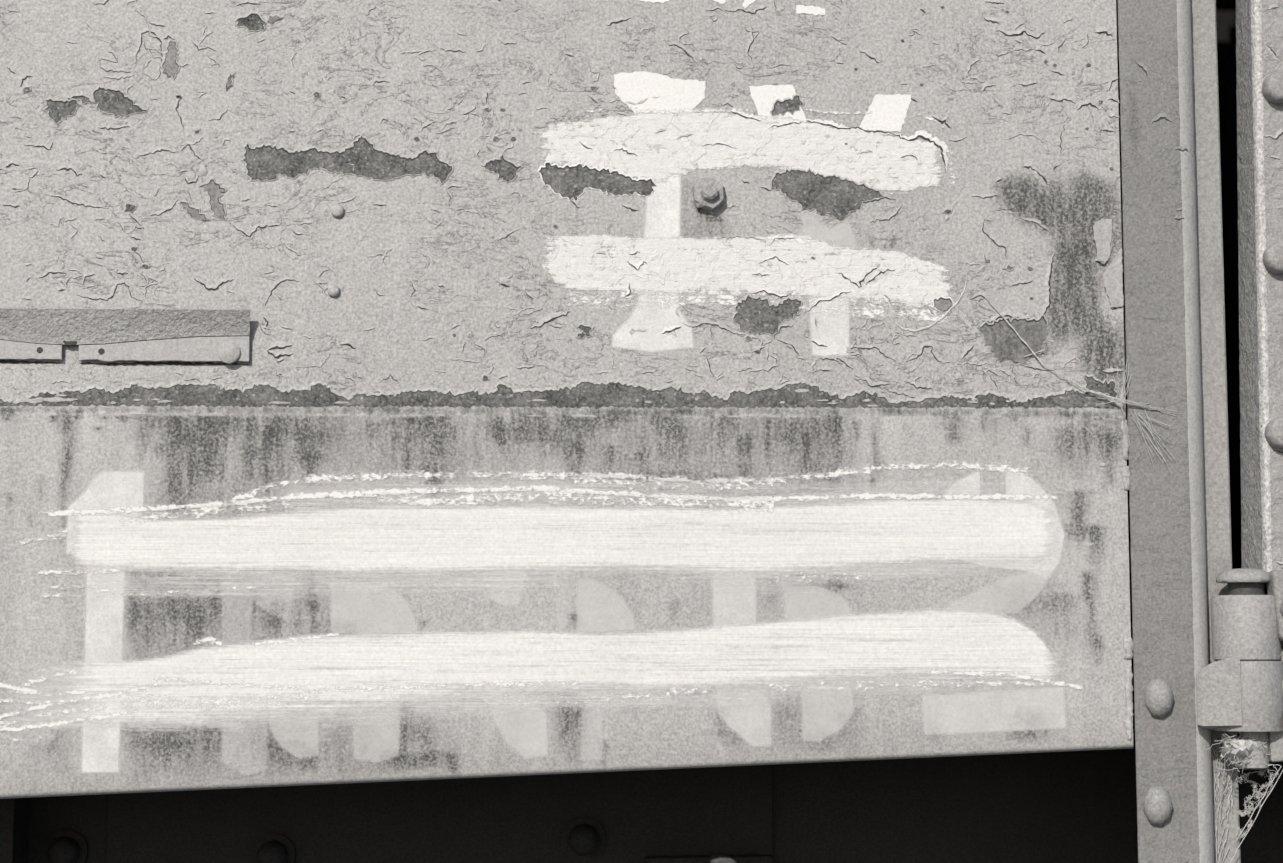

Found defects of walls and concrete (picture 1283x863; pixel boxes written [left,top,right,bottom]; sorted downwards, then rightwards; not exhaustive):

peeling [22,85,148,125]
crack [0,0,260,301]
peeling [241,133,454,185]
peeling [481,135,657,202]
crack [288,0,1149,398]
peeling [769,167,885,221]
crack [1151,113,1188,151]
crack [228,184,571,407]
peeling [732,293,803,353]
peeling [980,315,1049,364]
crack [174,371,245,383]
peeling [1082,374,1119,400]